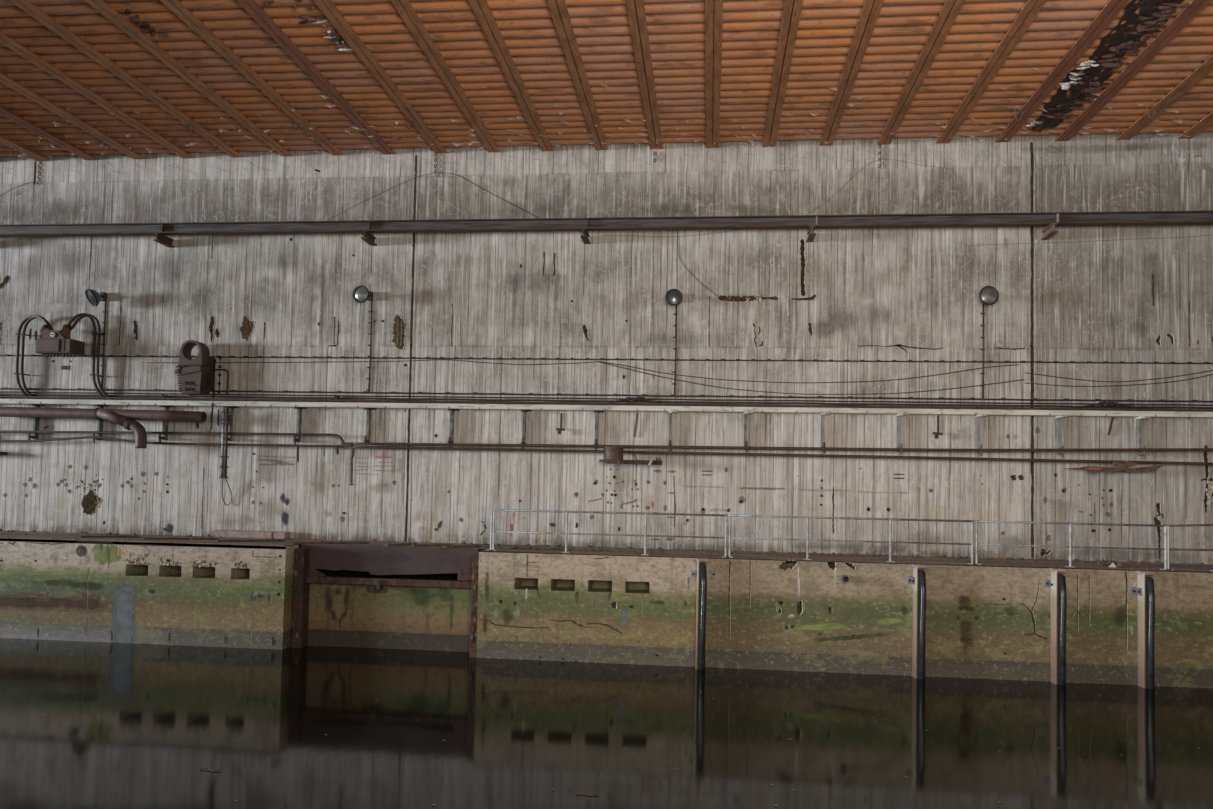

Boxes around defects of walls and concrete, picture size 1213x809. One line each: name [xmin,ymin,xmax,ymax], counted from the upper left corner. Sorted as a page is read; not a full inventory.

peeling [1060,60,1099,90]
spalling [240,315,255,341]
spalling [373,314,409,367]
spalling [57,465,103,515]
spalling [779,560,799,571]
leakage [0,580,158,643]
spalling [778,600,803,630]
leakage [775,566,907,641]
leakage [957,596,978,648]